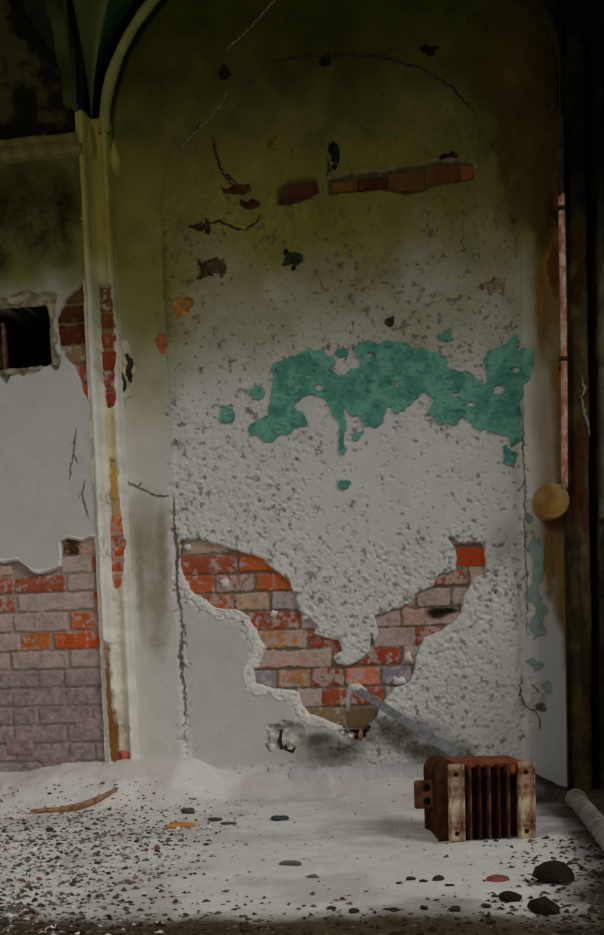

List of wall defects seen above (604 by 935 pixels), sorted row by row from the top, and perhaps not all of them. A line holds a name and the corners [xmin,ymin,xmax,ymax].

crack [226,0,275,51]
spalling [278,141,478,206]
spalling [0,286,137,408]
crack [69,427,89,518]
peeling [218,405,235,423]
peeling [248,333,534,465]
spalling [0,460,126,772]
spalling [171,538,486,753]